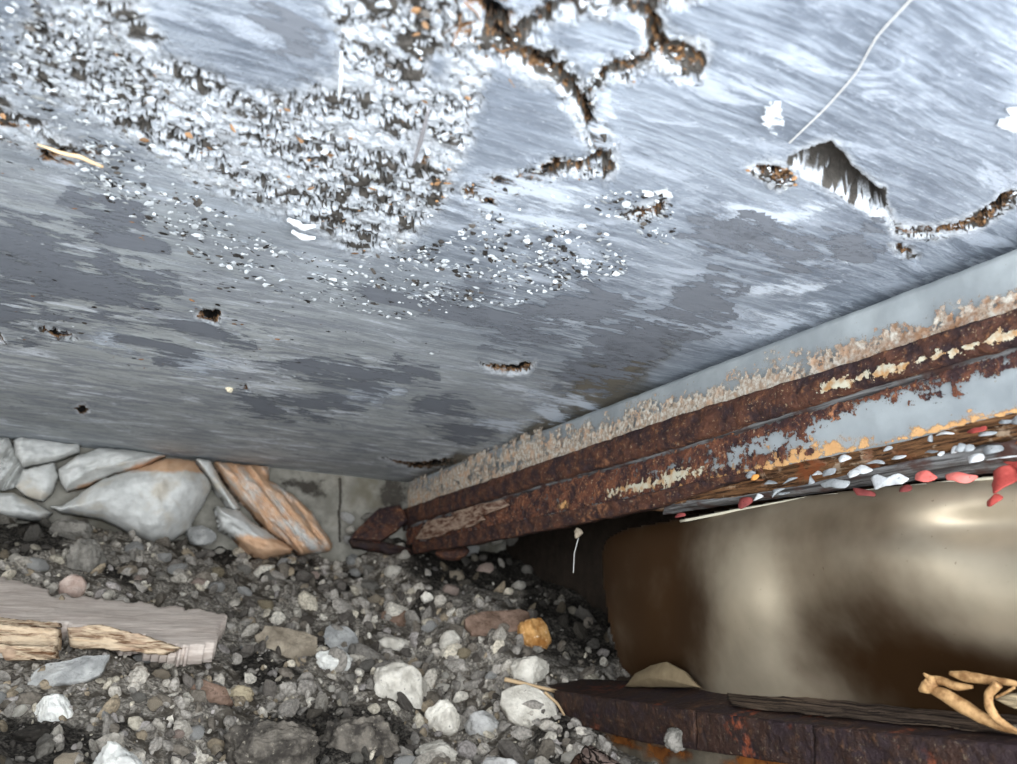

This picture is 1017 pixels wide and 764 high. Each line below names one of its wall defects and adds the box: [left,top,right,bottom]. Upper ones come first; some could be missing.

spalling [0,0,676,321]
spalling [740,150,798,201]
spalling [881,180,1017,265]
spalling [0,305,92,356]
spalling [189,299,244,331]
corrosion [406,326,1017,554]
peeling [738,416,1017,509]
corrosion [611,735,689,764]